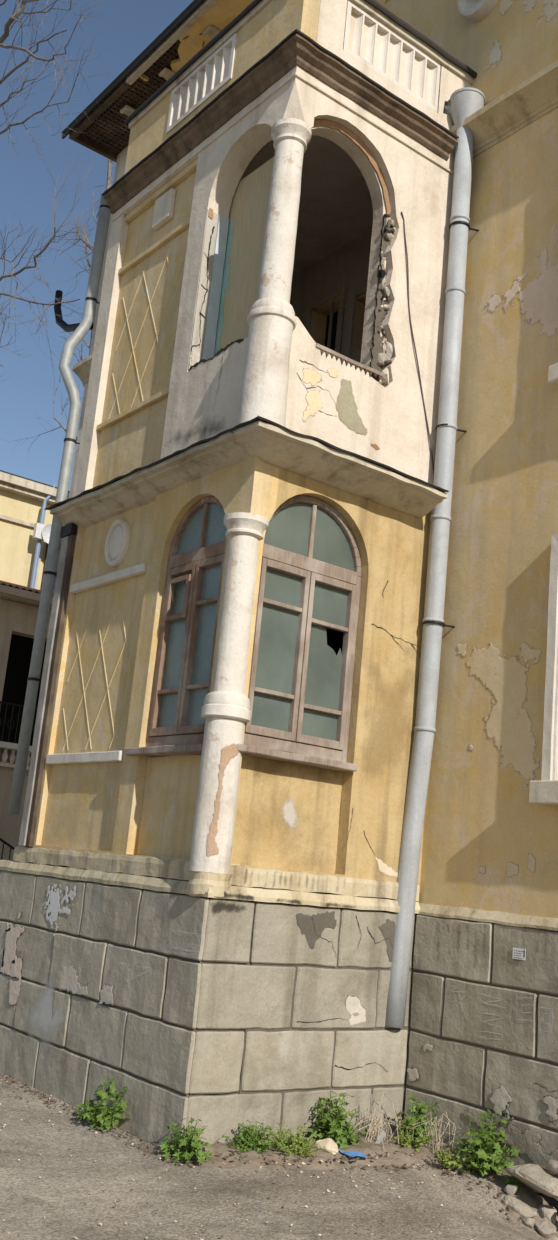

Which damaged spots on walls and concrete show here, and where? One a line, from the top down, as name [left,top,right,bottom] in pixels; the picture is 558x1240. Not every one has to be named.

spalling [314,119,396,387]
peeling [484,247,558,337]
flaking render [302,361,380,450]
peeling [457,642,542,788]
peeling [206,743,239,857]
peeling [44,884,76,931]
spalling [0,912,25,1006]
spalling [59,964,114,1005]
spalling [345,995,366,1025]
spalling [463,1085,558,1175]
flaking render [537,1192,558,1216]